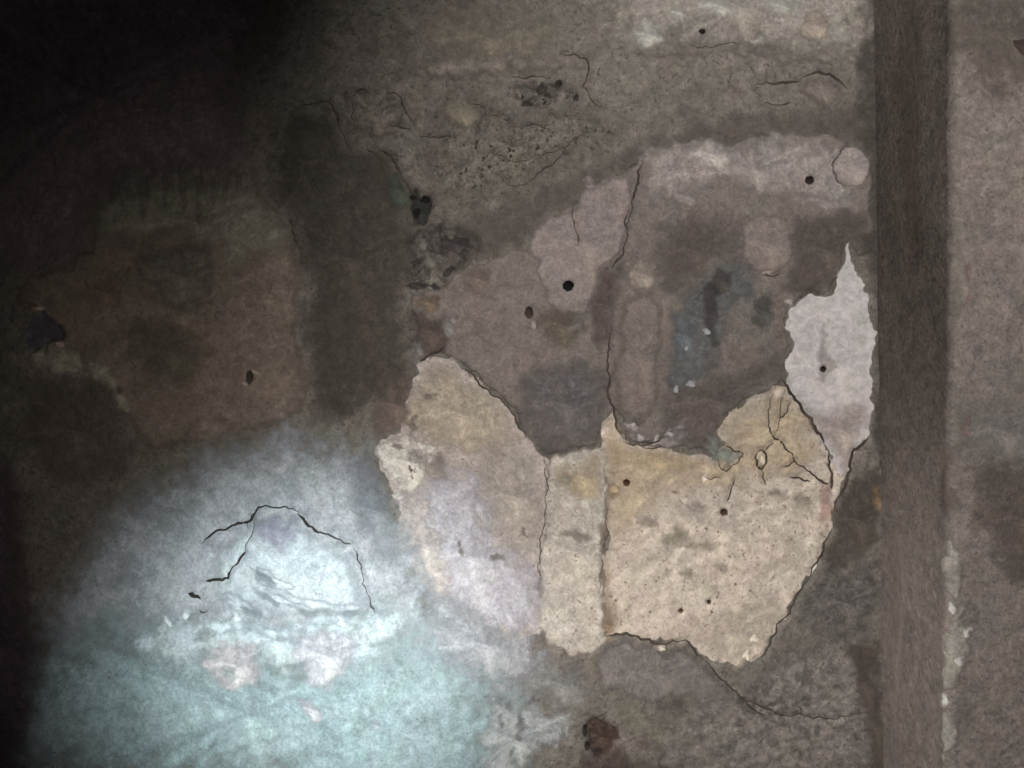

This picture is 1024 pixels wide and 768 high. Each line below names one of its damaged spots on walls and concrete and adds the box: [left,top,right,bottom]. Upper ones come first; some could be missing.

crack [303,53,600,195]
crack [755,71,847,106]
crack [612,159,643,268]
spalling [374,80,877,768]
crack [606,326,664,449]
crack [188,505,375,613]
crack [707,380,868,660]
crack [606,632,859,720]